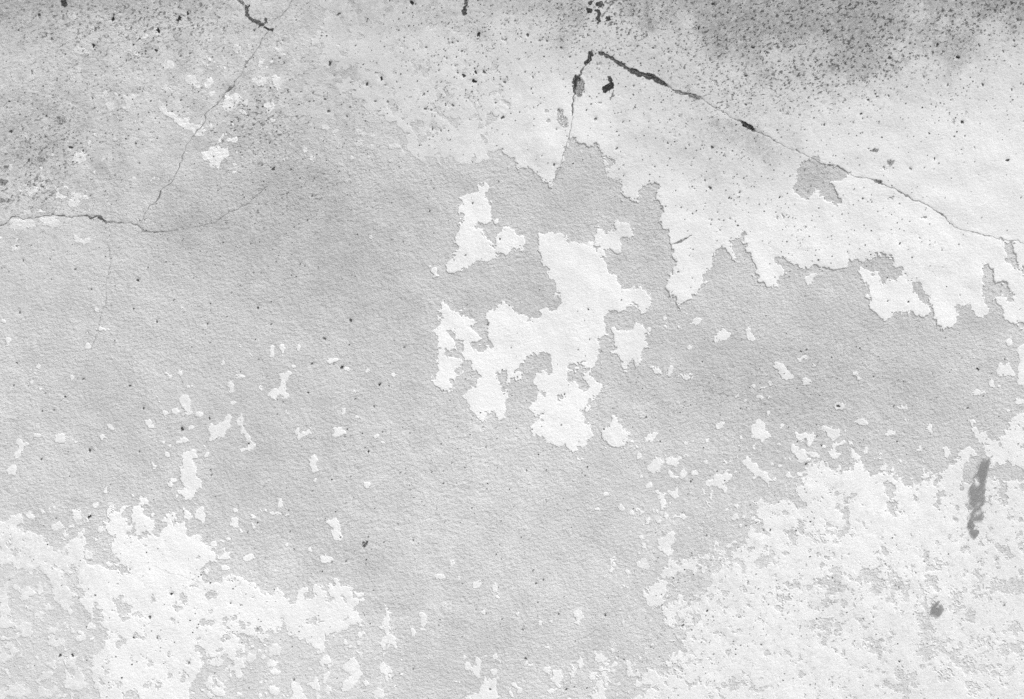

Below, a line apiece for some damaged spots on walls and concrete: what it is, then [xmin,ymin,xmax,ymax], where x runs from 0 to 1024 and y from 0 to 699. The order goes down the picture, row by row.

peeling [0,133,105,262]
crack [0,1,292,401]
peeling [126,0,1024,395]
crack [552,50,1023,243]
peeling [0,370,429,699]
peeling [237,344,301,414]
peeling [430,220,1024,699]